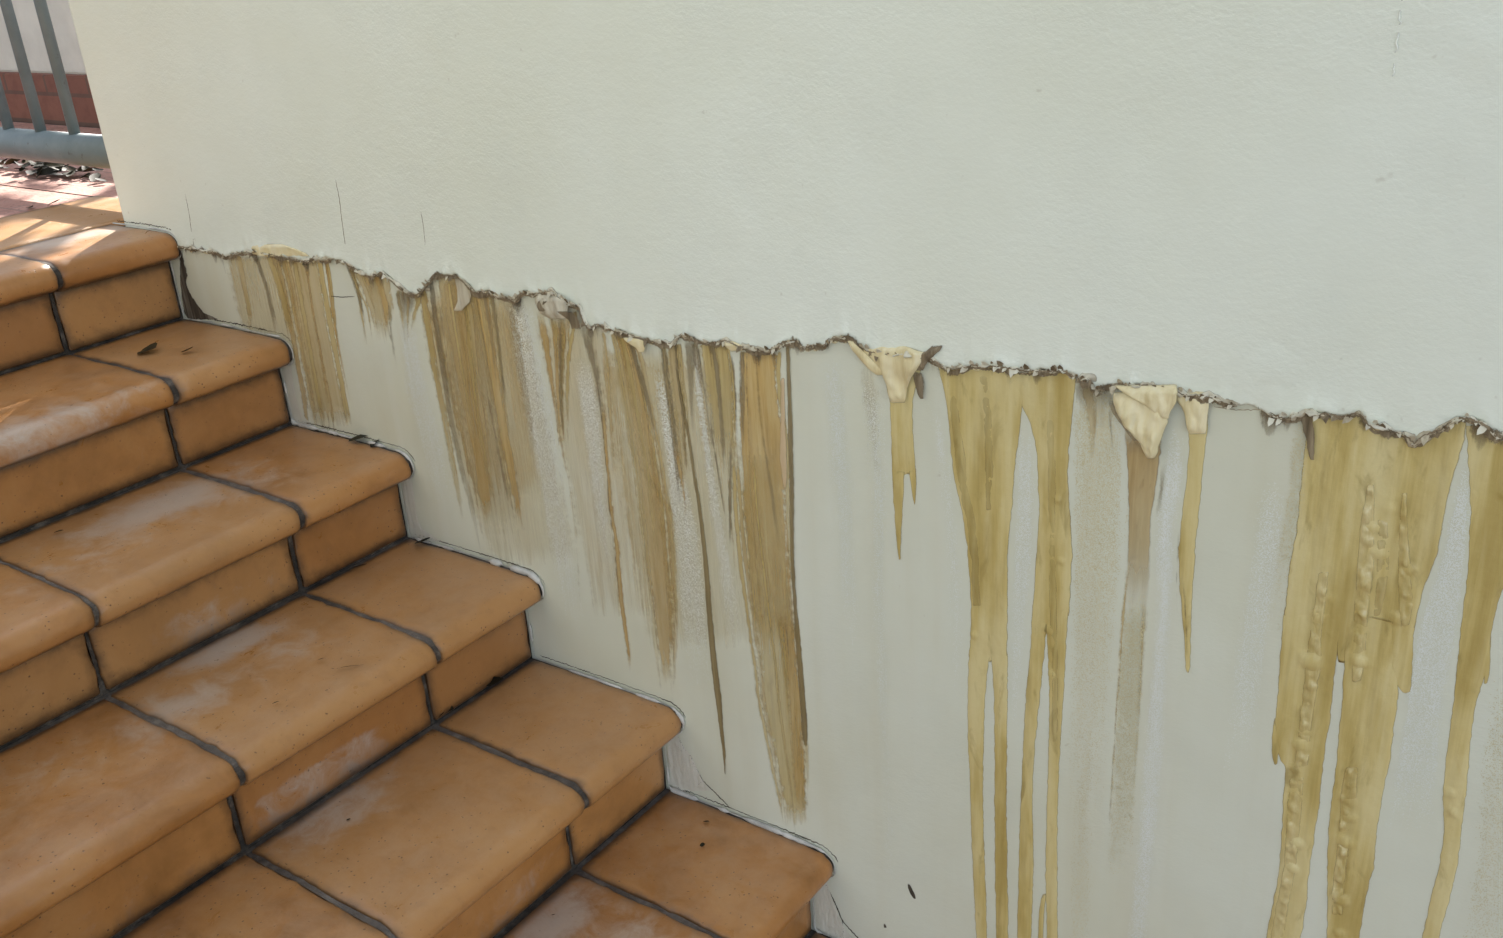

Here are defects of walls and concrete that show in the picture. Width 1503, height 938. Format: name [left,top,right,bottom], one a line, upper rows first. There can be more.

spalling [402,476,441,541]
damp [504,304,583,616]
damp [574,350,741,684]
peeling [177,244,1238,459]
damp [886,370,920,560]
peeling [1260,408,1503,460]
spalling [667,735,711,791]
damp [939,367,1208,938]
damp [1223,412,1503,938]
spalling [812,883,852,938]